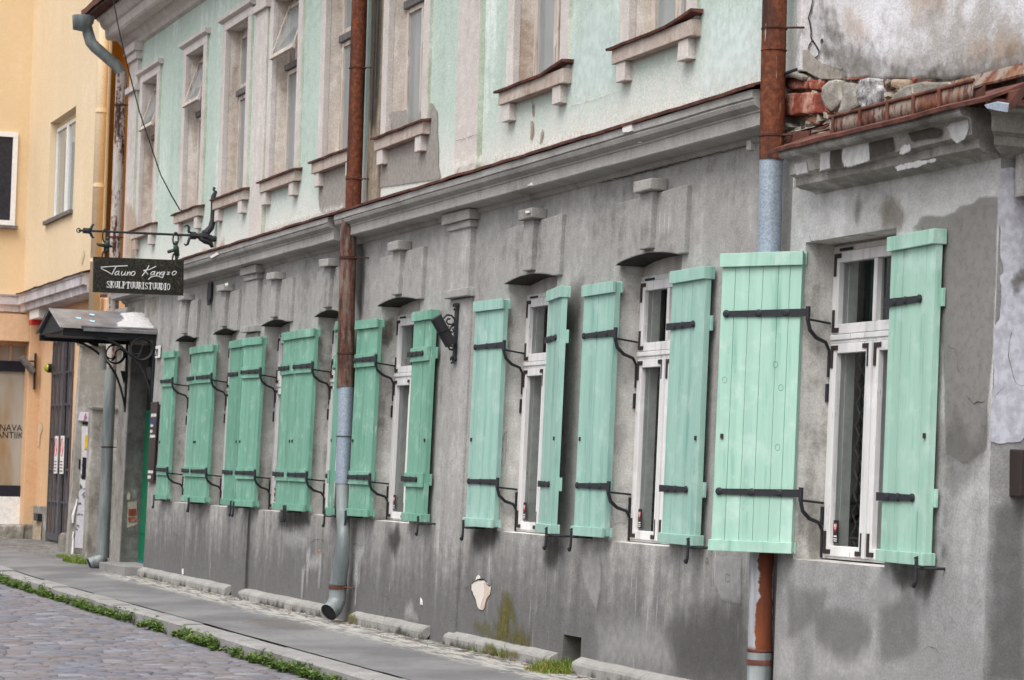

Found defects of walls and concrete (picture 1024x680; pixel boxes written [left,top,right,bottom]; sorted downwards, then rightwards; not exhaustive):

crack [808,0,843,71]
rust [759,0,787,160]
peeling [947,120,969,143]
peeling [795,161,807,175]
peeling [820,143,870,171]
peeling [895,144,936,171]
peeling [990,167,1024,444]
damp [914,196,997,463]
spalling [464,575,492,610]
damp [875,570,934,602]